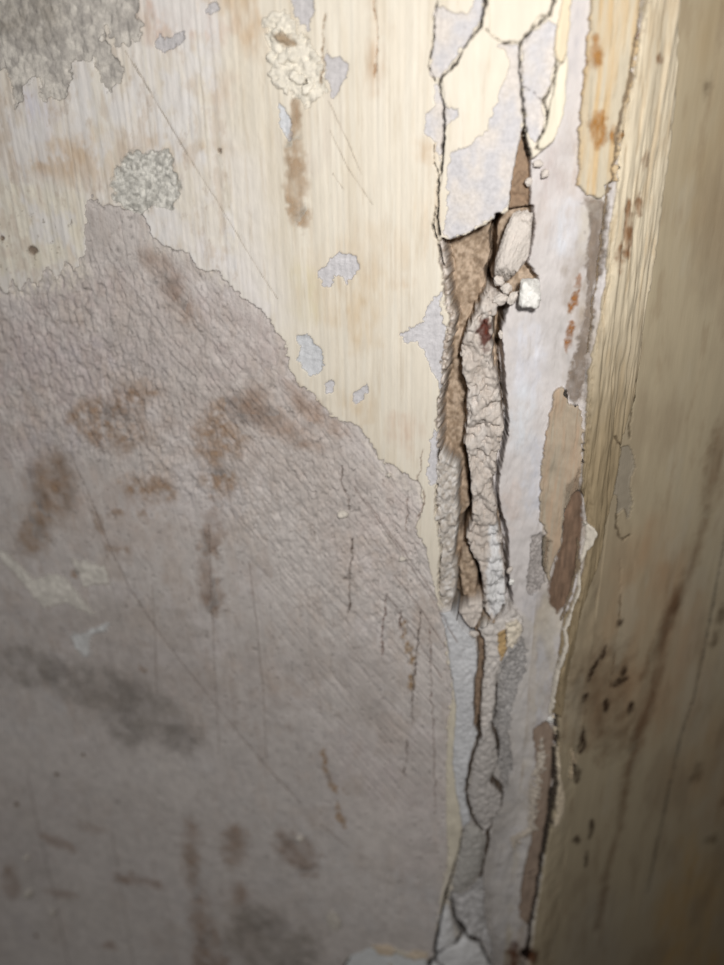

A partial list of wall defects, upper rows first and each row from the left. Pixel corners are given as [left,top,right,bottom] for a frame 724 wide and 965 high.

flaking render [0,0,572,965]
crack [427,625,503,965]
crack [429,0,556,265]
peeling [510,0,681,925]